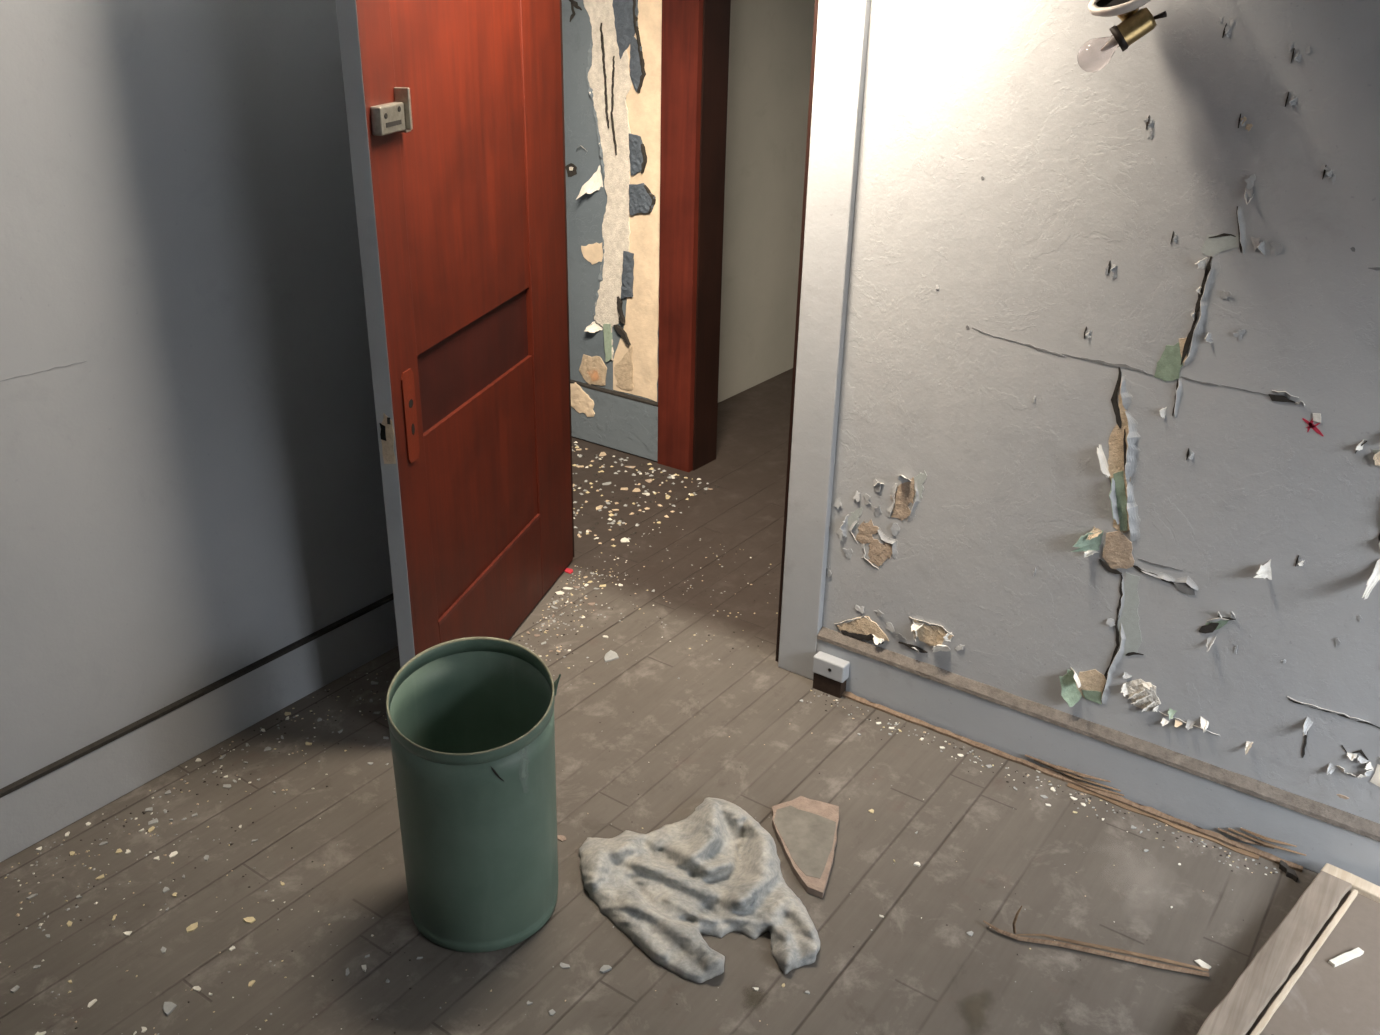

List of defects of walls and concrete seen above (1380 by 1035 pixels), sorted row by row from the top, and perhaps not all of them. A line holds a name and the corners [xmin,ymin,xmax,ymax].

peeling [565,0,662,417]
peeling [1154,174,1283,418]
crack [972,327,1268,395]
peeling [1268,390,1321,423]
peeling [1072,367,1141,574]
peeling [834,470,927,570]
peeling [1253,559,1272,580]
peeling [1362,533,1380,600]
peeling [834,605,965,653]
peeling [1199,611,1236,652]
peeling [1059,667,1220,736]
peeling [1327,745,1380,787]